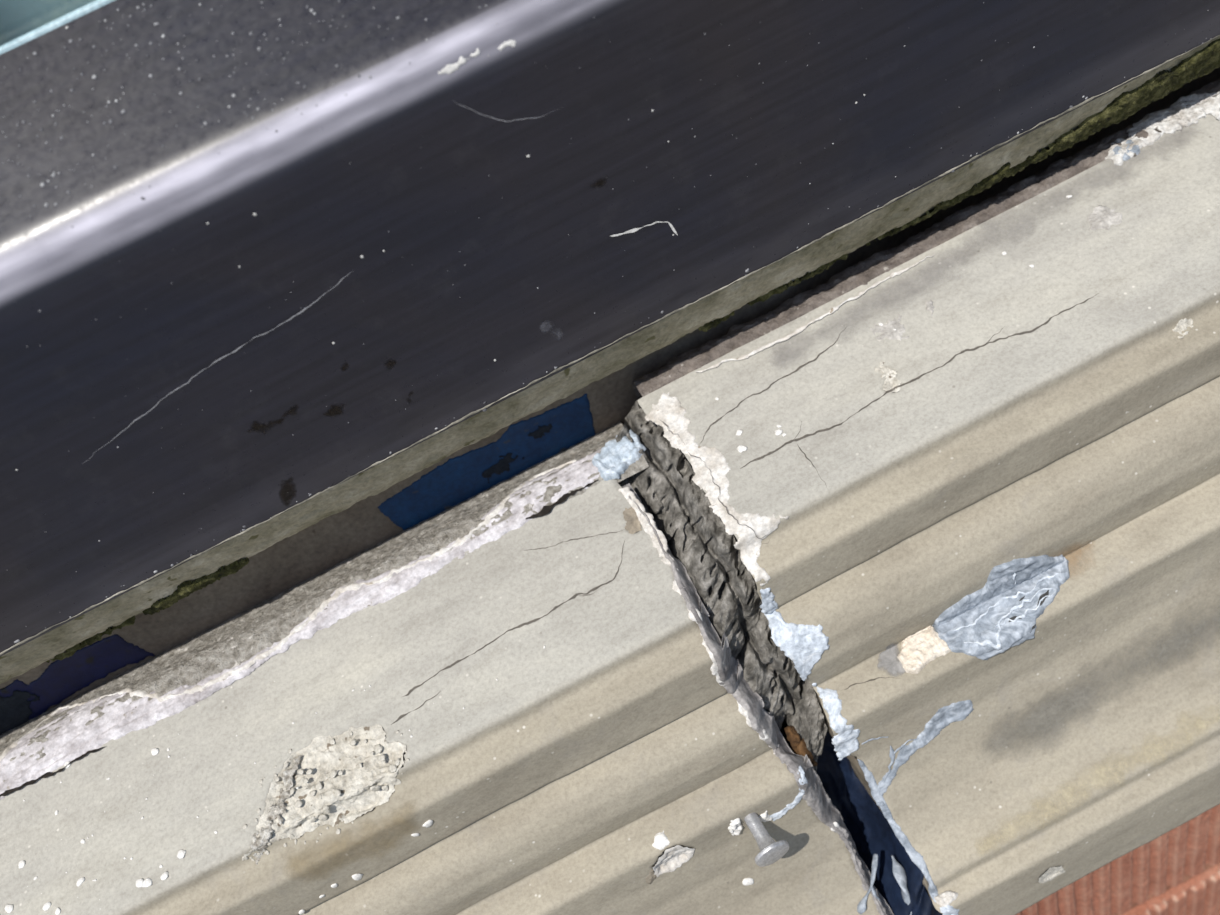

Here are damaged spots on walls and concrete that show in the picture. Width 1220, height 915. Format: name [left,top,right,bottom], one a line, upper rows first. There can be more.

crack [658,293,1099,545]
crack [526,480,598,519]
crack [392,530,625,724]
spalling [242,724,410,865]
corrosion [784,725,818,767]